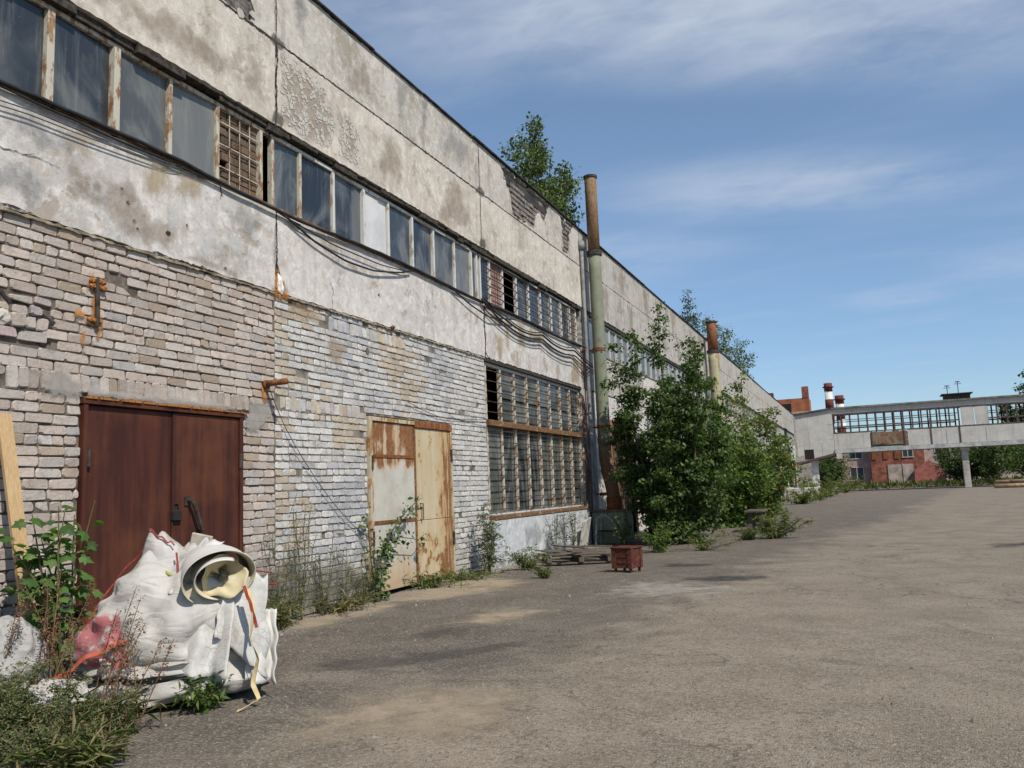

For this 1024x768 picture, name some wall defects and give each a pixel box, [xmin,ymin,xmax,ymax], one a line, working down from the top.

spalling [501,168,548,229]
spalling [560,217,572,253]
corrosion [75,276,103,344]